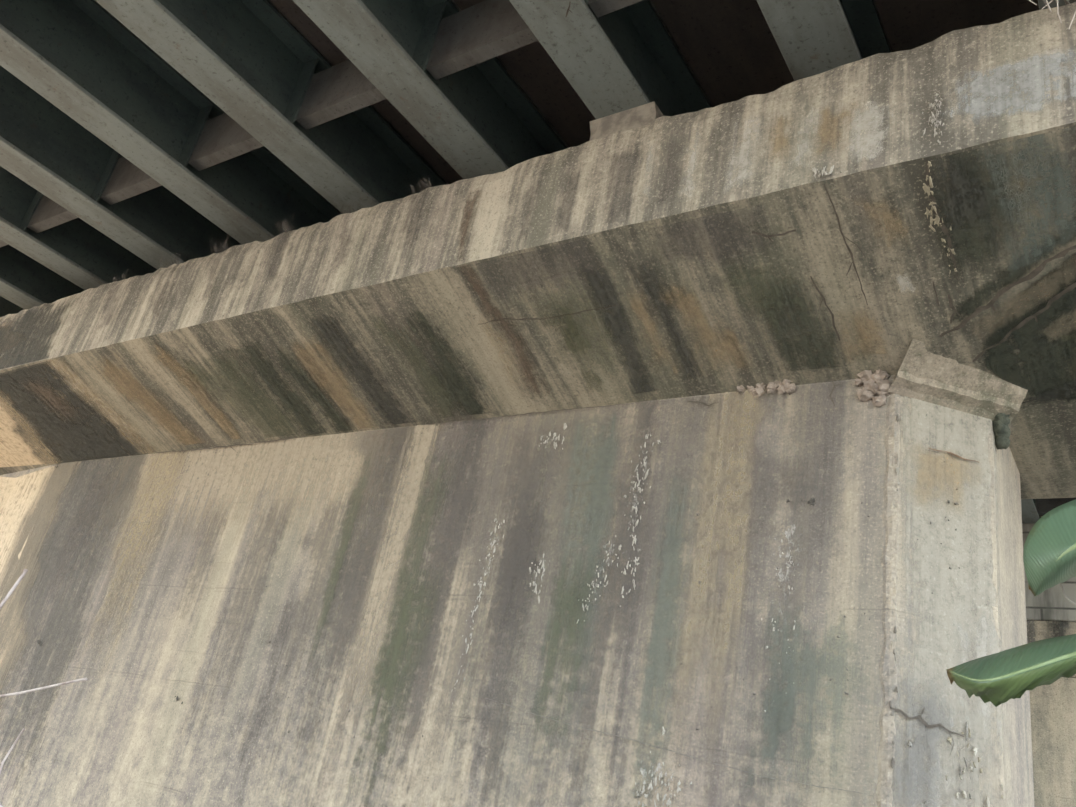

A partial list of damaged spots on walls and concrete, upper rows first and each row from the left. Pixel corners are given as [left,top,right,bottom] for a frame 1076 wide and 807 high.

damp [405,311,490,415]
damp [587,272,655,394]
damp [630,264,700,378]
damp [753,281,839,371]
crack [810,276,840,340]
crack [824,184,868,305]
damp [935,133,1076,404]
damp [0,302,451,755]
damp [879,397,1001,807]
crack [890,707,964,755]